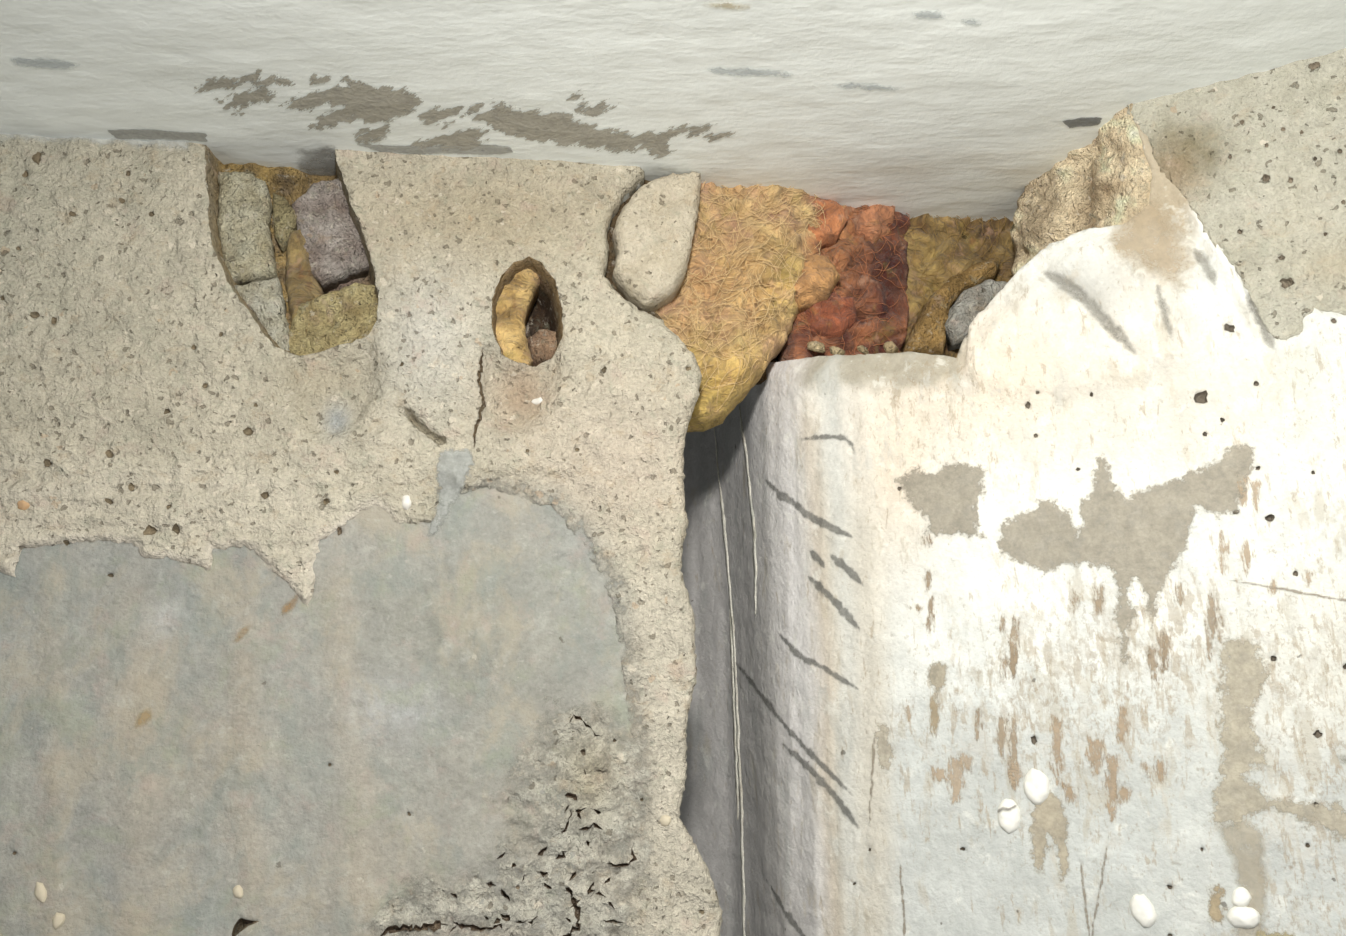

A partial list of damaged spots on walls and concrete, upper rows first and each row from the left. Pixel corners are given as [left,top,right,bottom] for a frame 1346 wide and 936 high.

spalling [1010,48,1346,340]
crack [473,351,486,446]
spalling [0,69,735,936]
damp [894,445,1254,663]
crack [570,715,600,737]
crack [380,770,637,936]
damp [1028,790,1069,881]